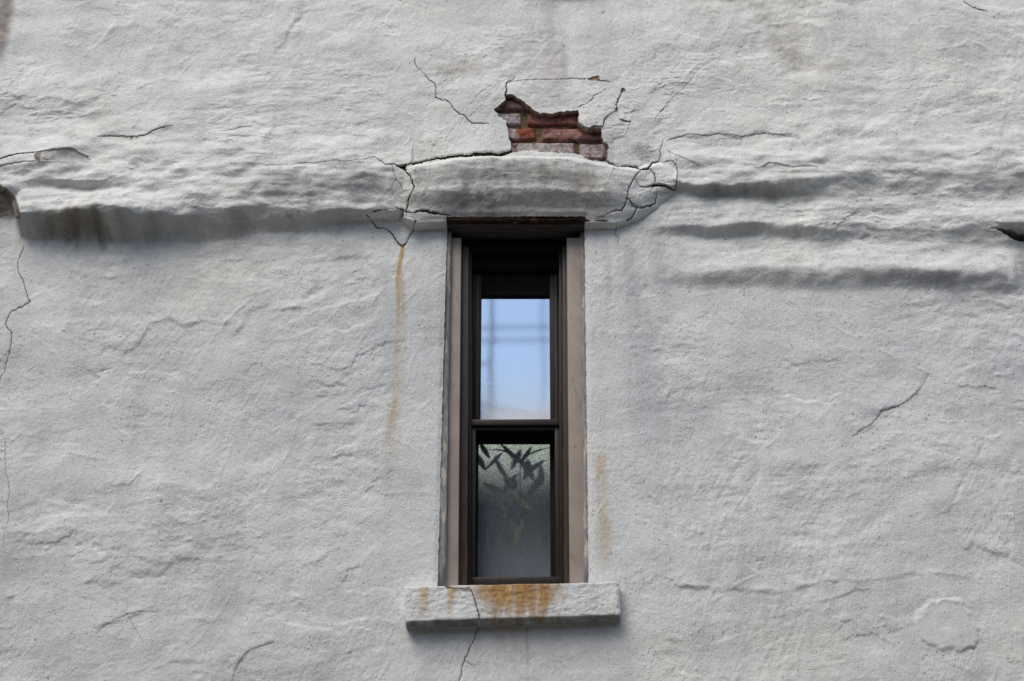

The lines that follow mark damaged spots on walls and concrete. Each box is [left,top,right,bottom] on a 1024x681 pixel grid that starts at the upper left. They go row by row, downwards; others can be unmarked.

crack [0,152,35,167]
crack [102,125,172,139]
crack [269,151,512,247]
crack [414,58,622,125]
spalling [494,76,631,162]
crack [0,247,31,380]
crack [446,586,480,681]
rust [478,584,553,616]